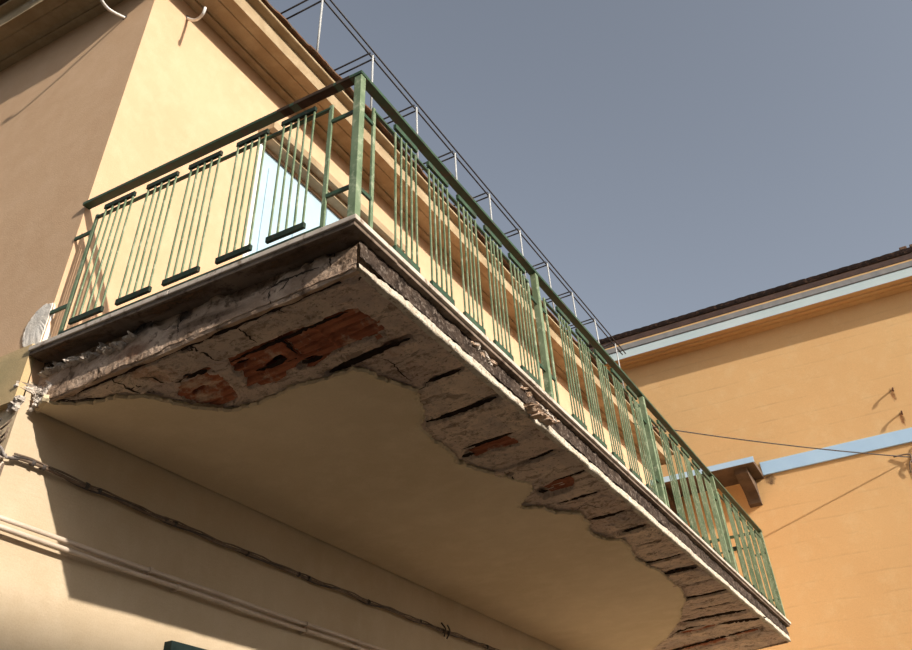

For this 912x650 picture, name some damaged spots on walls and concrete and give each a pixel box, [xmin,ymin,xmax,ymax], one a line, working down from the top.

crack [266,253,335,313]
crack [177,319,220,361]
crack [43,367,186,402]
flaking render [6,267,786,650]